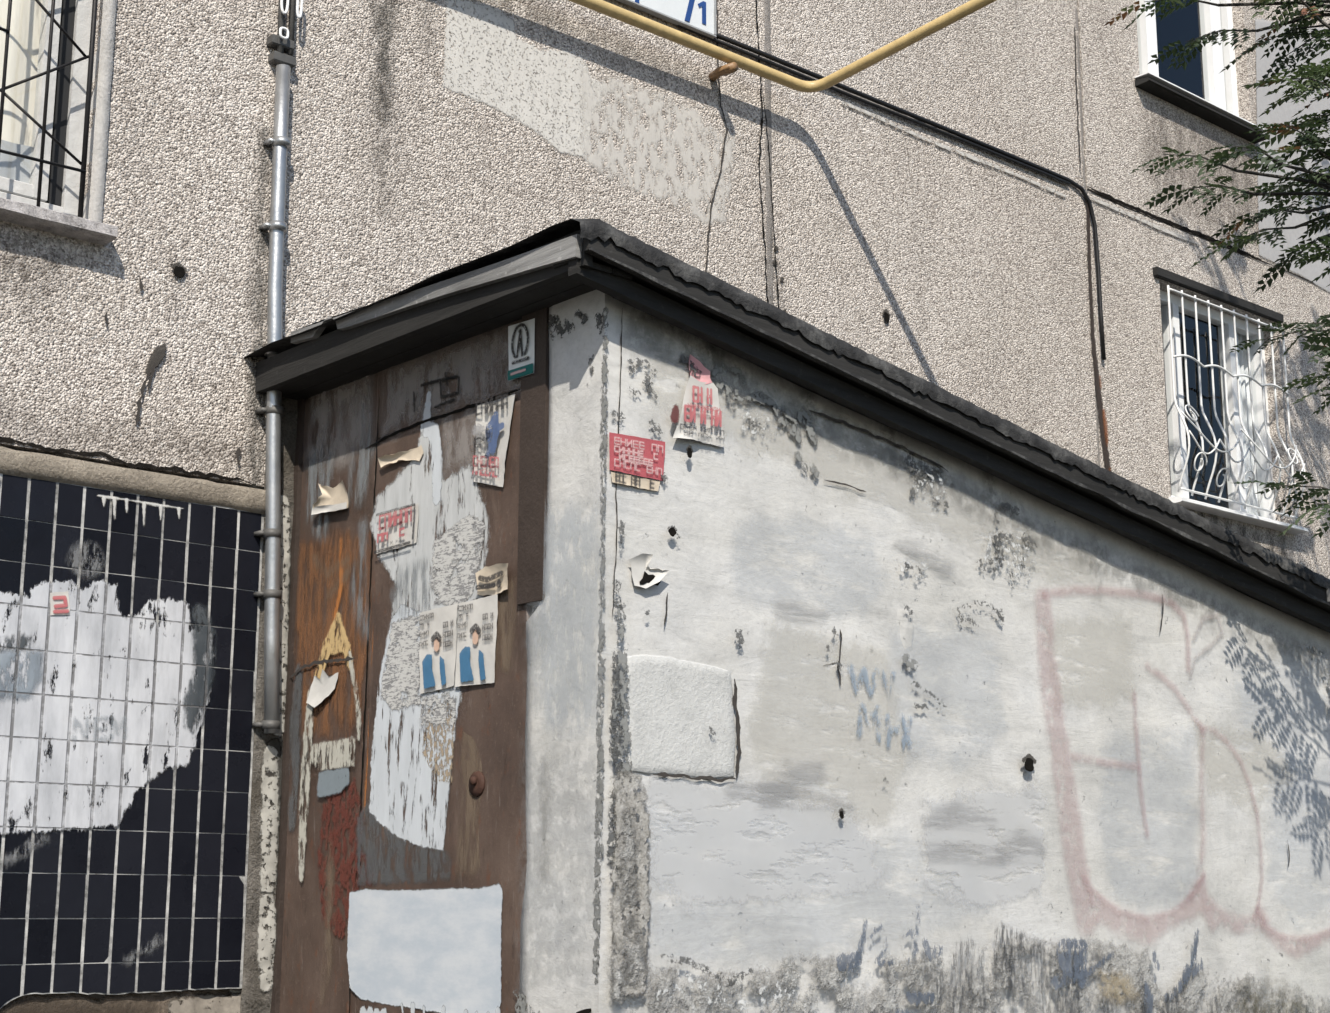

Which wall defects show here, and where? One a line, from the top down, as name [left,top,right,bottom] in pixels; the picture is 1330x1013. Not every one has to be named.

crack [705,0,779,308]
peeling [257,495,292,992]
rust [297,533,373,733]
rust [317,731,377,939]
peeling [548,307,1330,1013]
spalling [168,988,242,1013]